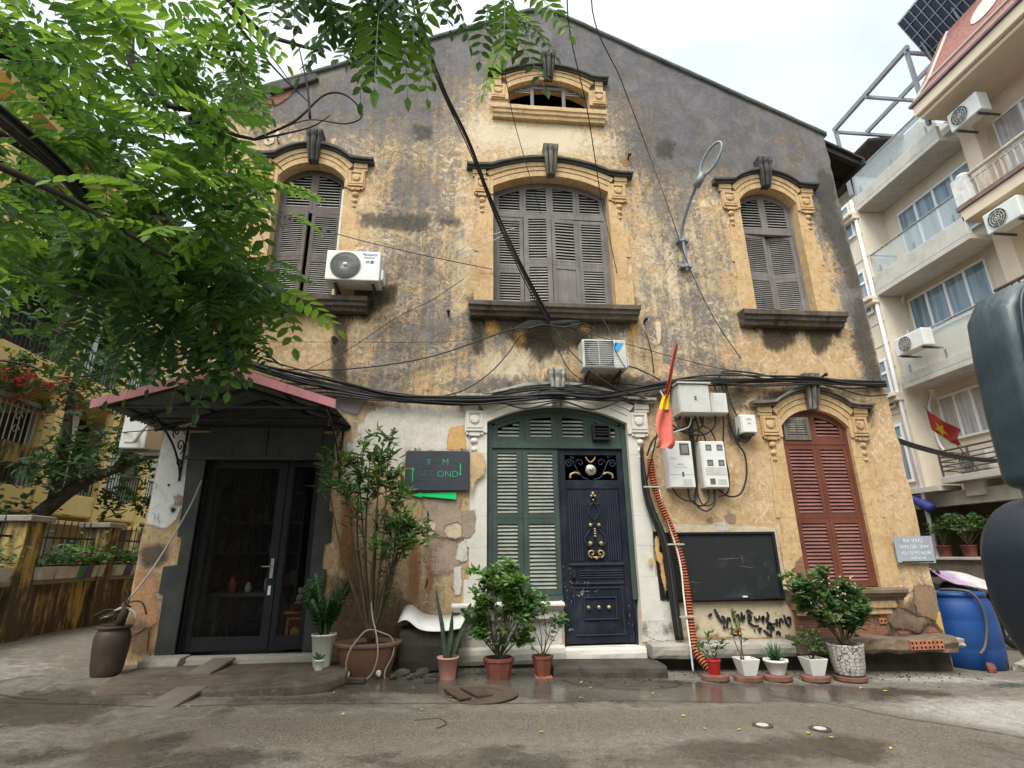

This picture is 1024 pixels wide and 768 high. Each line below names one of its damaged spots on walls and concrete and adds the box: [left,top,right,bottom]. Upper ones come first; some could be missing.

damp [472,318,632,361]
peeling [146,431,189,528]
peeling [344,403,486,596]
peeling [641,513,945,642]